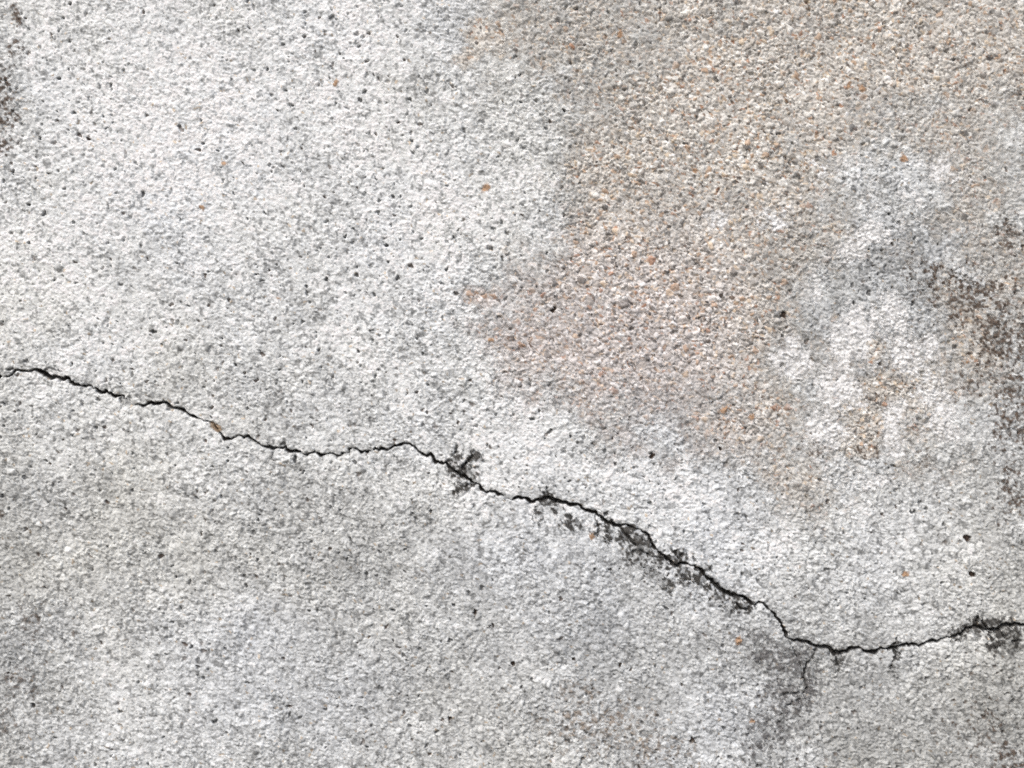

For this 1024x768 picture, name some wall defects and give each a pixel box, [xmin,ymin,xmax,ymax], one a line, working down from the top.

crack [0,367,1024,714]